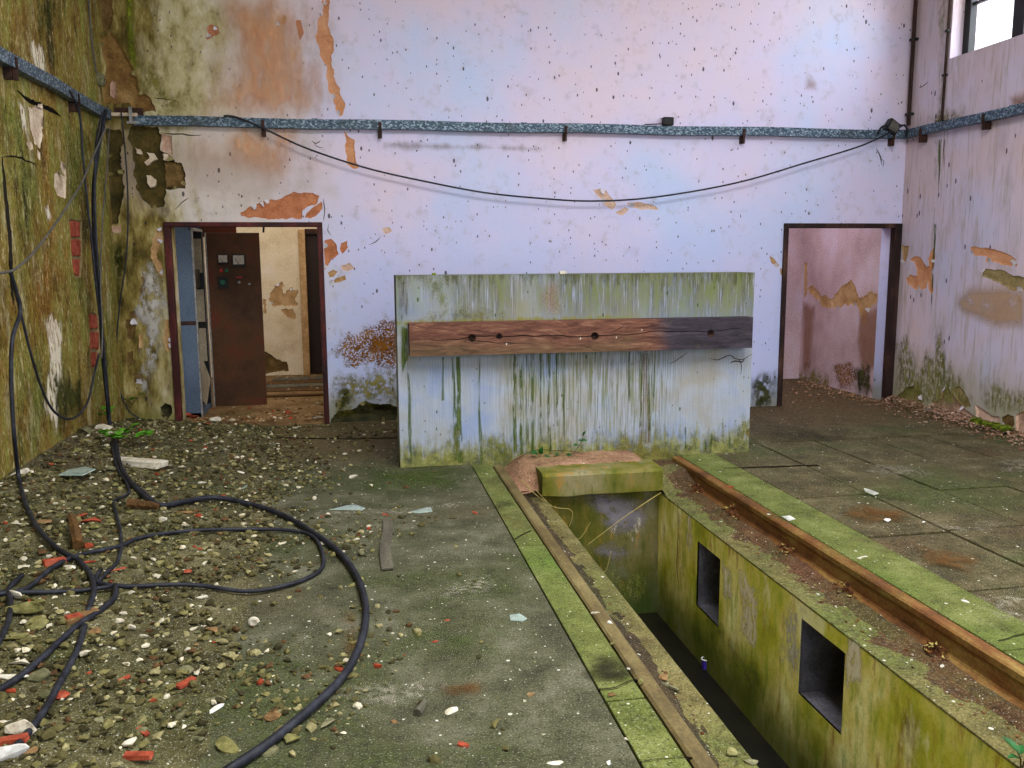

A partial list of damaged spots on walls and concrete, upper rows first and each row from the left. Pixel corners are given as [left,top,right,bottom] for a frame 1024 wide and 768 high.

water stain [31,40,45,70]
peeling [276,0,345,116]
crack [17,90,60,116]
spalling [100,0,186,233]
peeling [240,192,322,220]
peeling [324,239,355,285]
peeling [804,262,878,320]
peeling [970,246,1024,292]
water stain [44,313,62,428]
water stain [442,357,463,463]
water stain [520,354,565,455]
water stain [846,640,861,686]